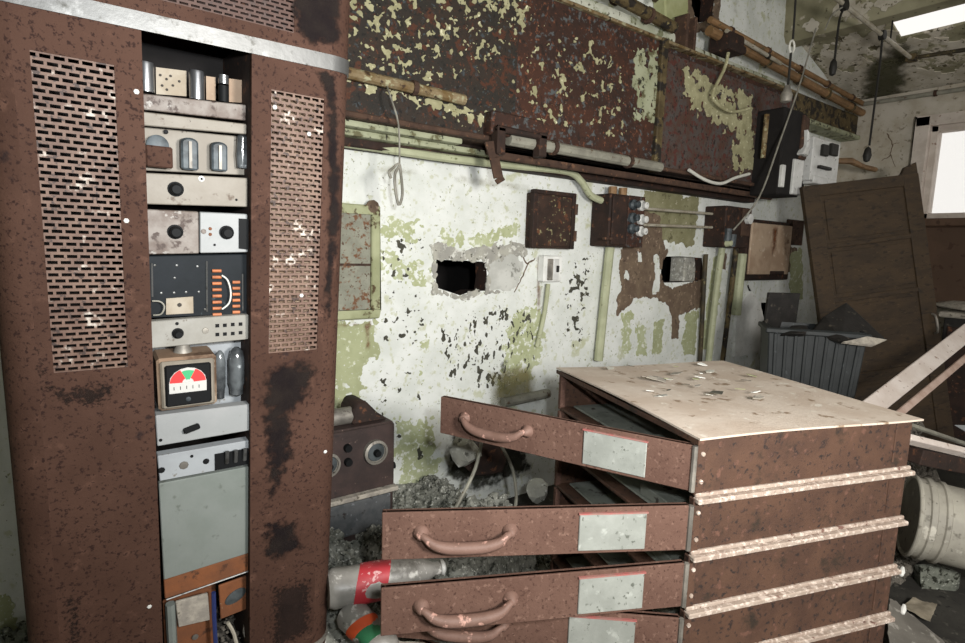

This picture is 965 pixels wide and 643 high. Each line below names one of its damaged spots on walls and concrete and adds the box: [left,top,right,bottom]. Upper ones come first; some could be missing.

flaking render [688,0,724,33]
peeling [802,18,819,33]
peeling [832,0,902,22]
peeling [817,24,965,102]
flaking render [380,216,528,301]
peeling [563,258,590,347]
flaking render [616,190,727,356]
peeling [334,298,546,409]
peeling [380,378,442,485]